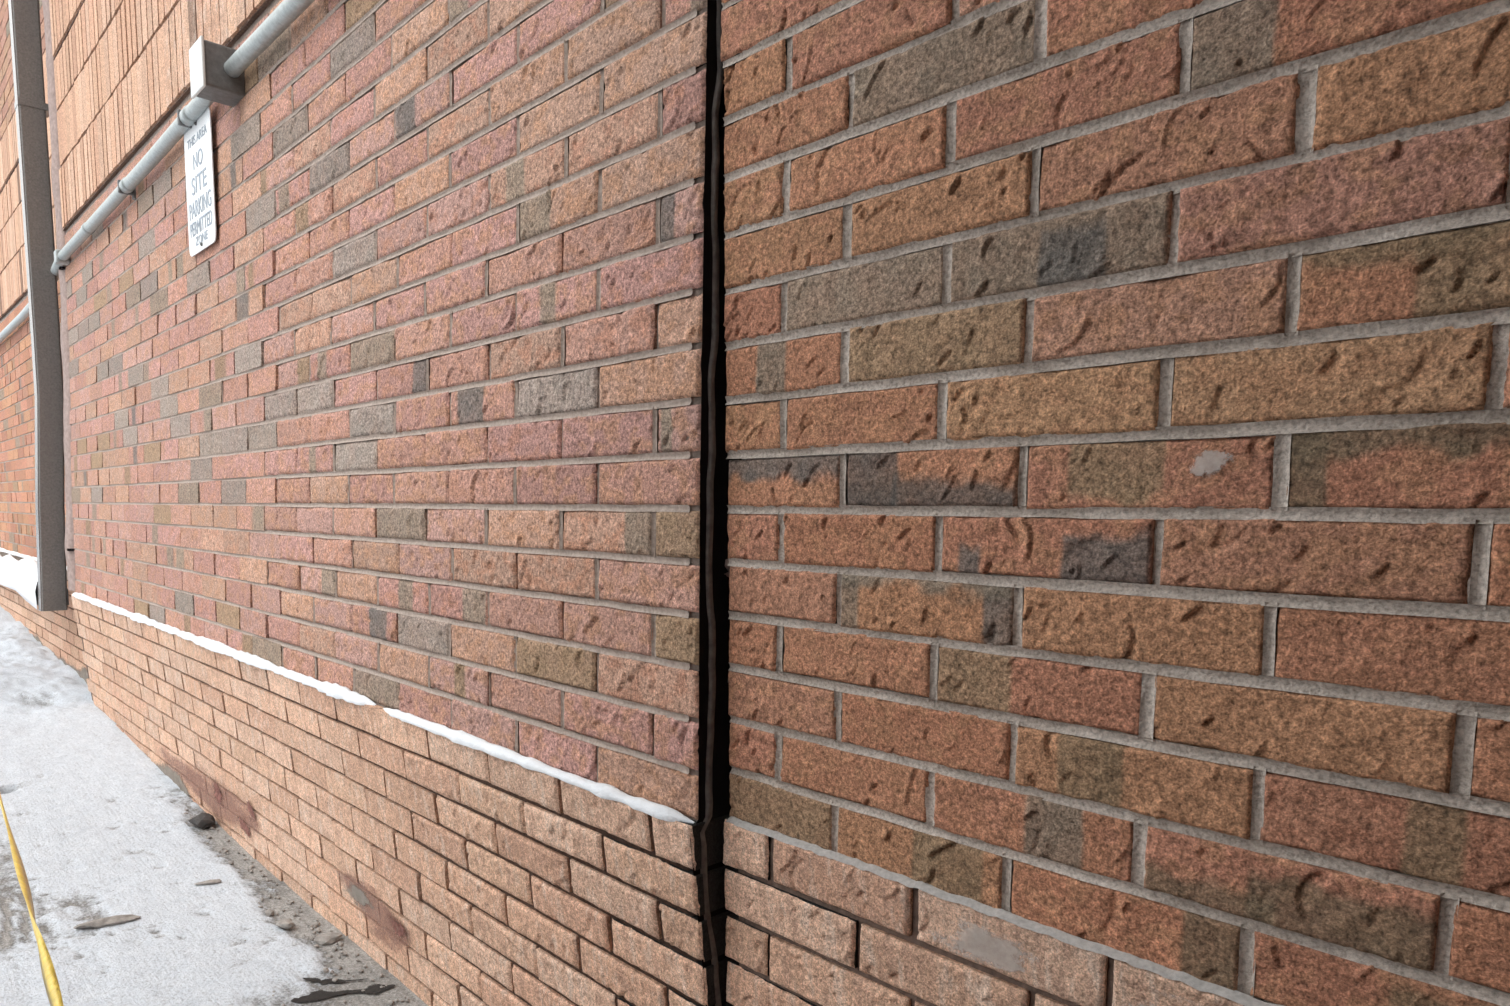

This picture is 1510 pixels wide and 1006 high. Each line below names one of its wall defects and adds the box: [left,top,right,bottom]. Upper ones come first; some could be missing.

crack [690,0,742,1006]